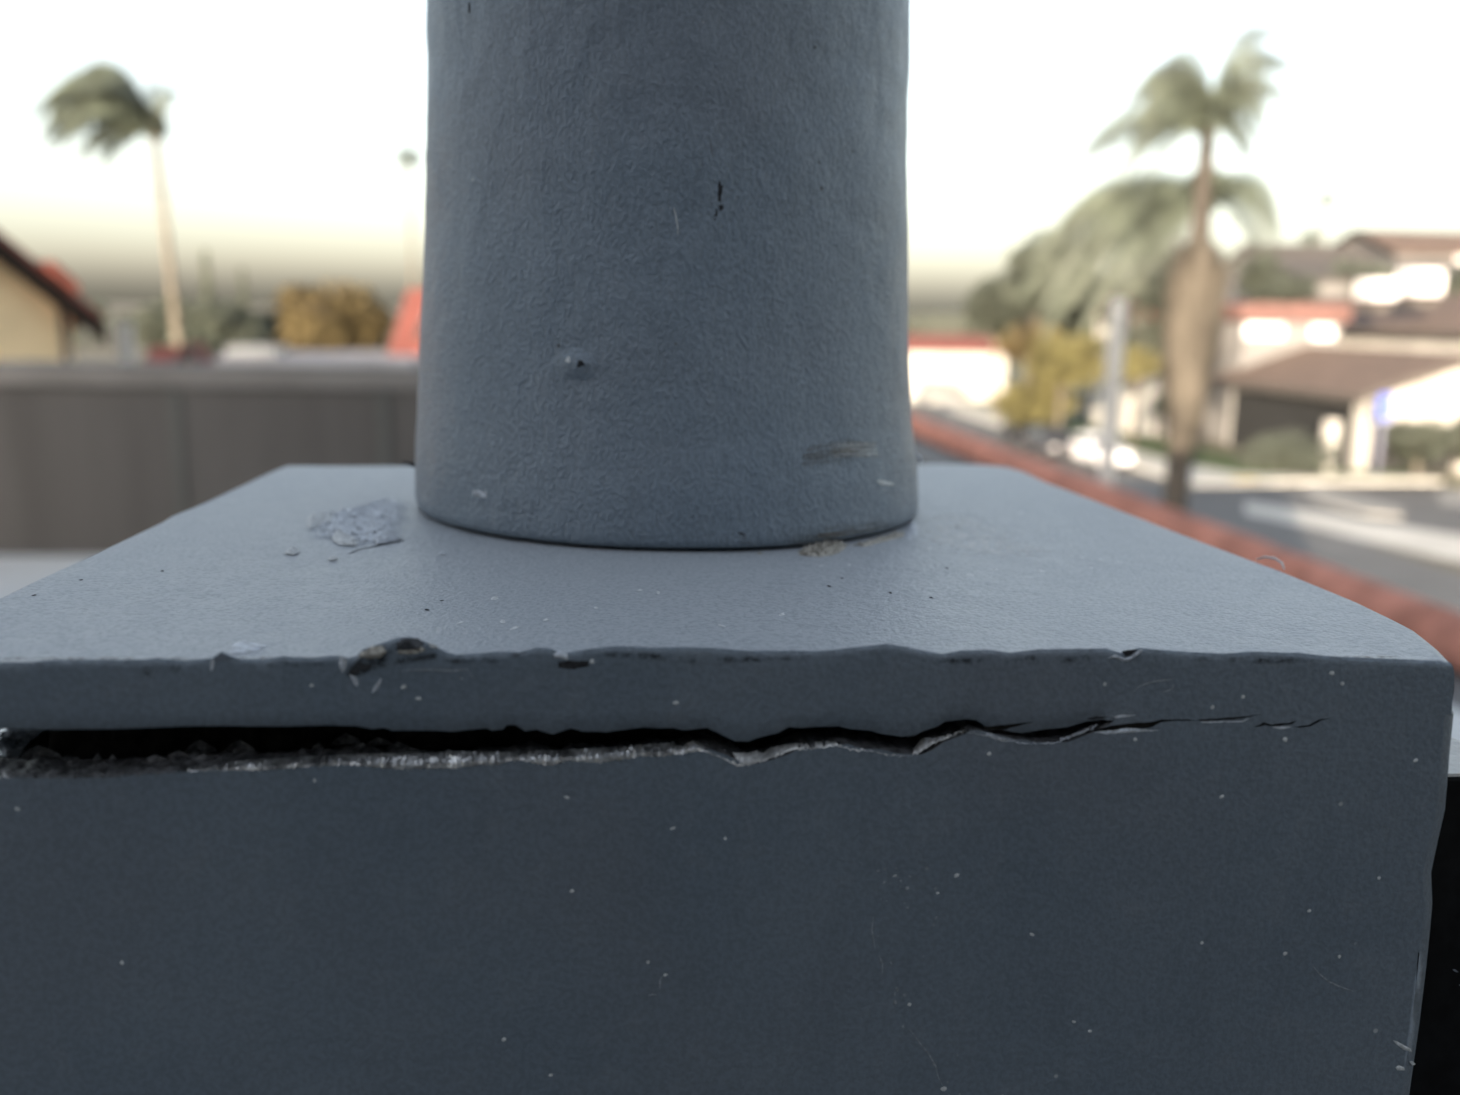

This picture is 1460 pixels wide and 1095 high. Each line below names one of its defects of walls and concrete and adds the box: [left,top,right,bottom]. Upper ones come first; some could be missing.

peeling [306,498,405,560]
peeling [339,638,462,693]
crack [0,715,1330,779]